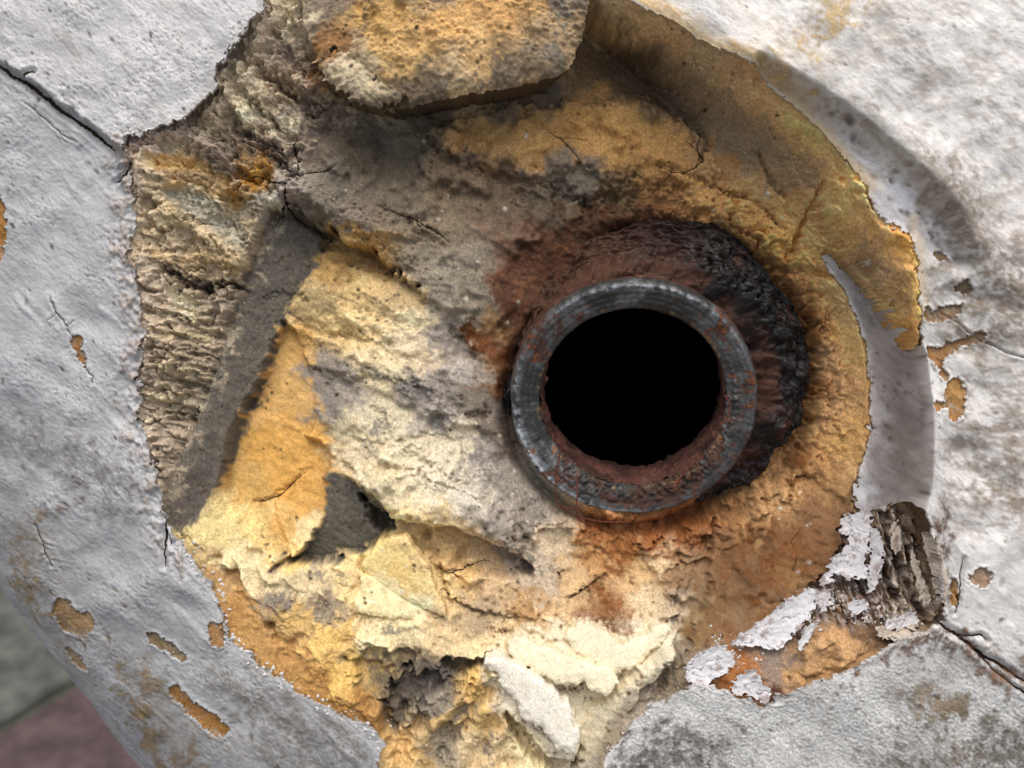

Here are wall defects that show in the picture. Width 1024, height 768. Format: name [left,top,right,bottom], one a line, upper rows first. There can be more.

crack [0,65,146,199]
corrosion [459,201,657,401]
peeling [923,279,974,323]
peeling [926,331,987,422]
peeling [146,632,187,663]
peeling [207,622,226,649]
peeling [683,511,993,704]
crack [935,559,1024,693]
peeling [169,685,230,738]